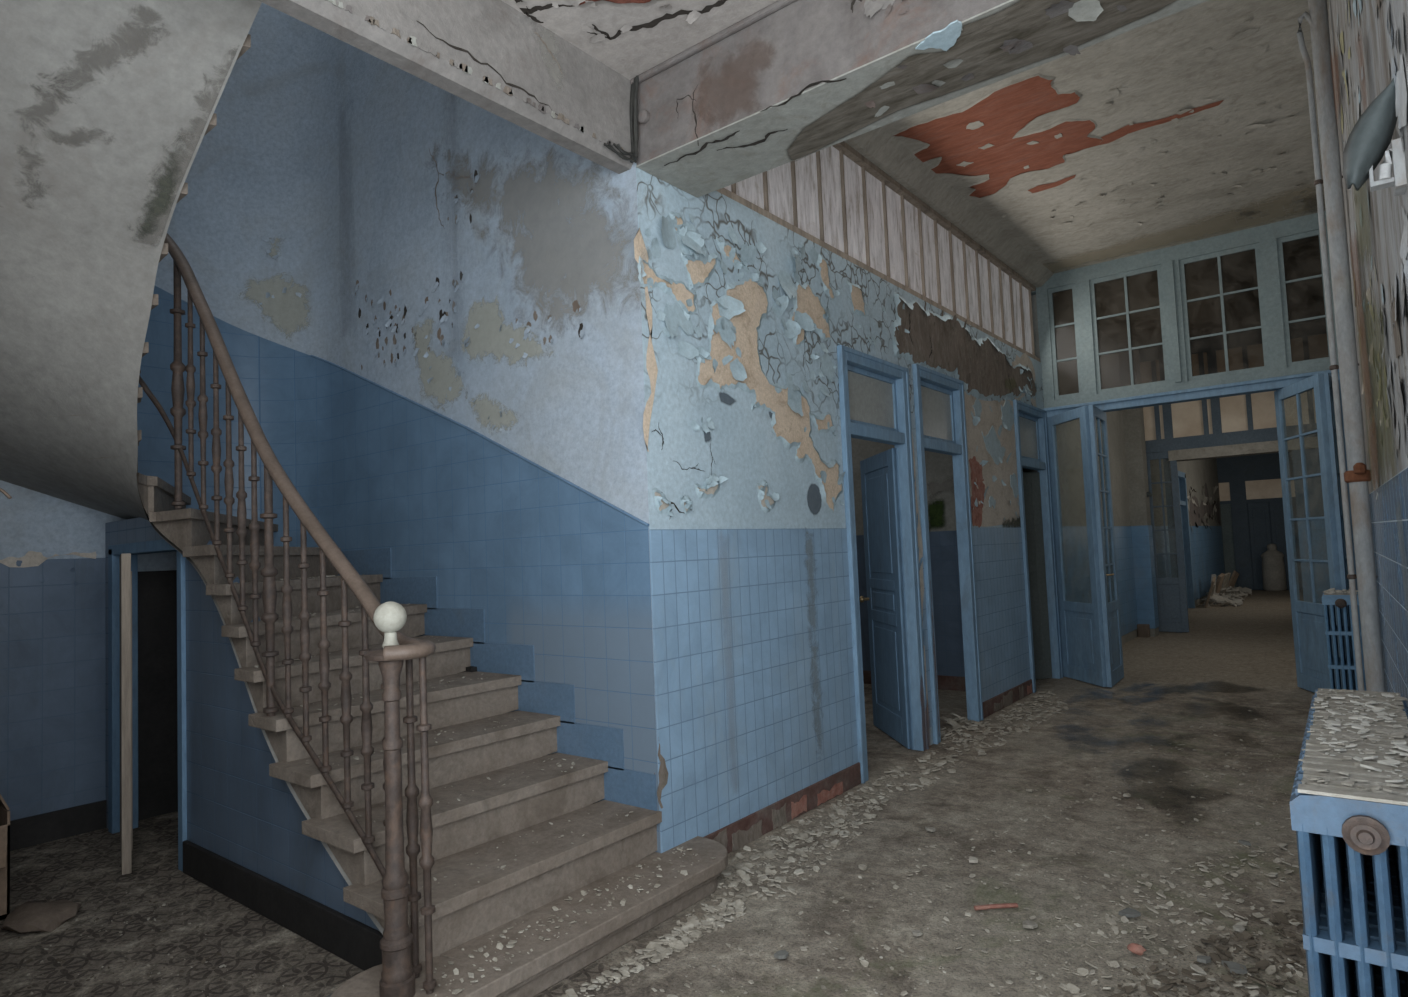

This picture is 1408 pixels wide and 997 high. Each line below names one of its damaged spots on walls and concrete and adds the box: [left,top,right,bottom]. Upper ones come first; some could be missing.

crack [417,21,557,115]
flaking render [573,0,662,8]
crack [515,0,727,73]
crack [676,85,699,146]
flaking render [664,0,1224,198]
peeling [1335,0,1408,151]
peeling [355,271,554,370]
peeling [572,300,585,339]
peeling [634,211,1037,528]
peeling [1354,208,1408,500]
peeling [912,436,928,718]